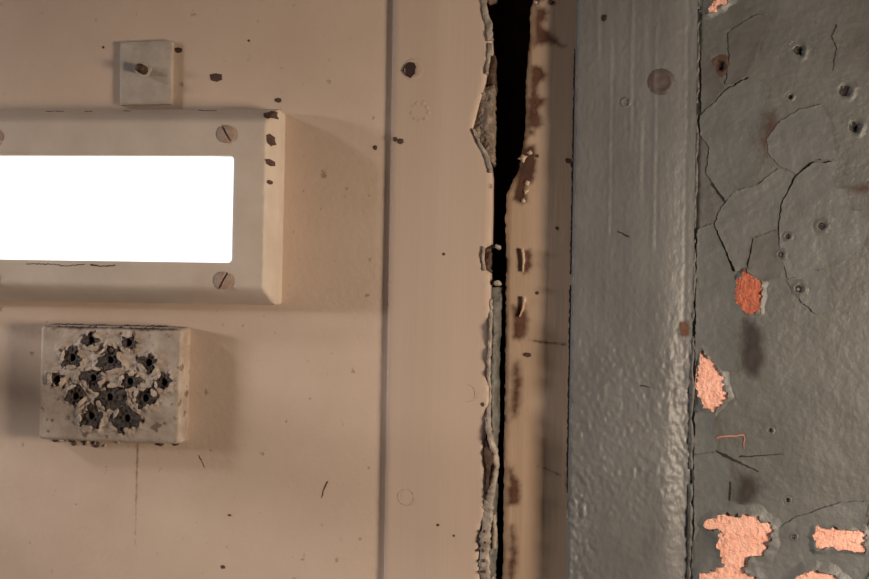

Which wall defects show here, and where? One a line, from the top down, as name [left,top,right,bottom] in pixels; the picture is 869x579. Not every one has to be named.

peeling [699,0,737,21]
crack [830,24,838,71]
crack [711,183,726,203]
peeling [691,50,869,579]
crack [716,450,784,472]